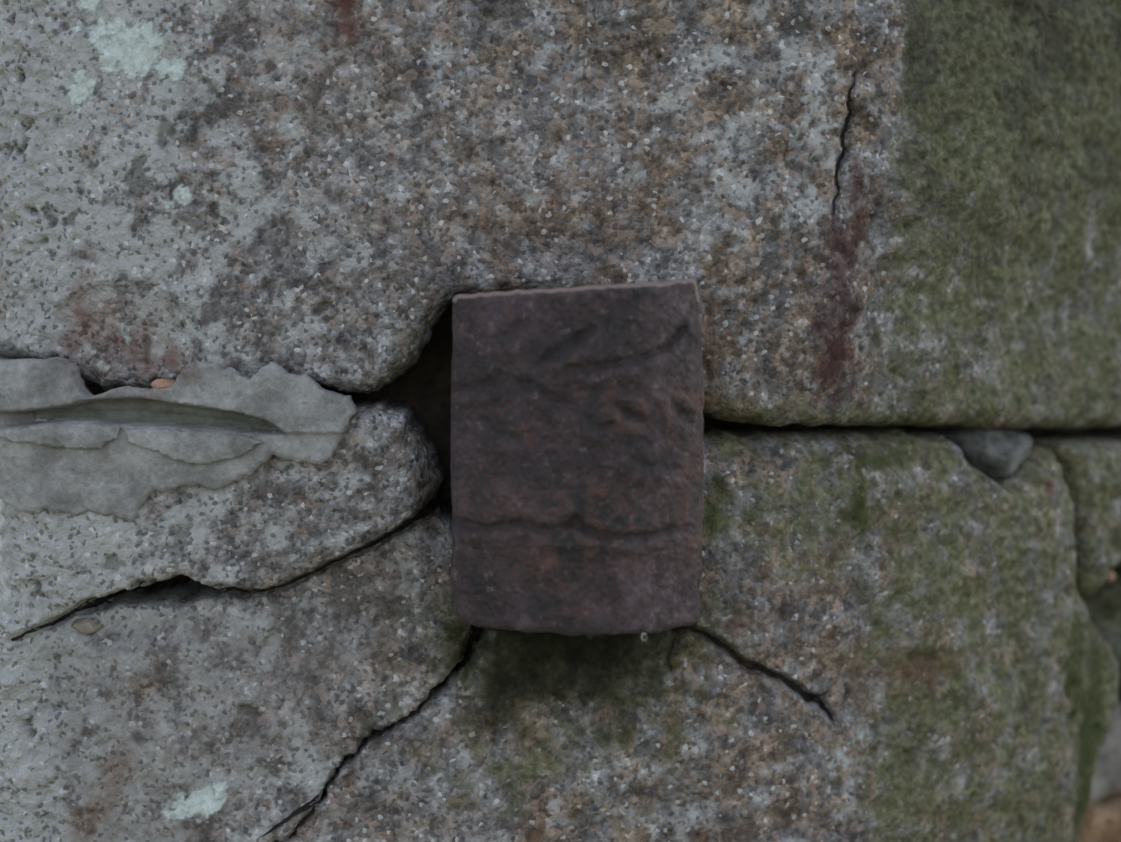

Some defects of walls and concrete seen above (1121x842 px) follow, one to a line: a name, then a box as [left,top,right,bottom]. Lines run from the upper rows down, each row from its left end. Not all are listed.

crack [833,75,855,215]
peeling [0,357,358,620]
crack [222,489,441,593]
crack [11,578,191,641]
crack [420,626,483,704]
crack [667,625,834,721]
crack [259,782,329,842]